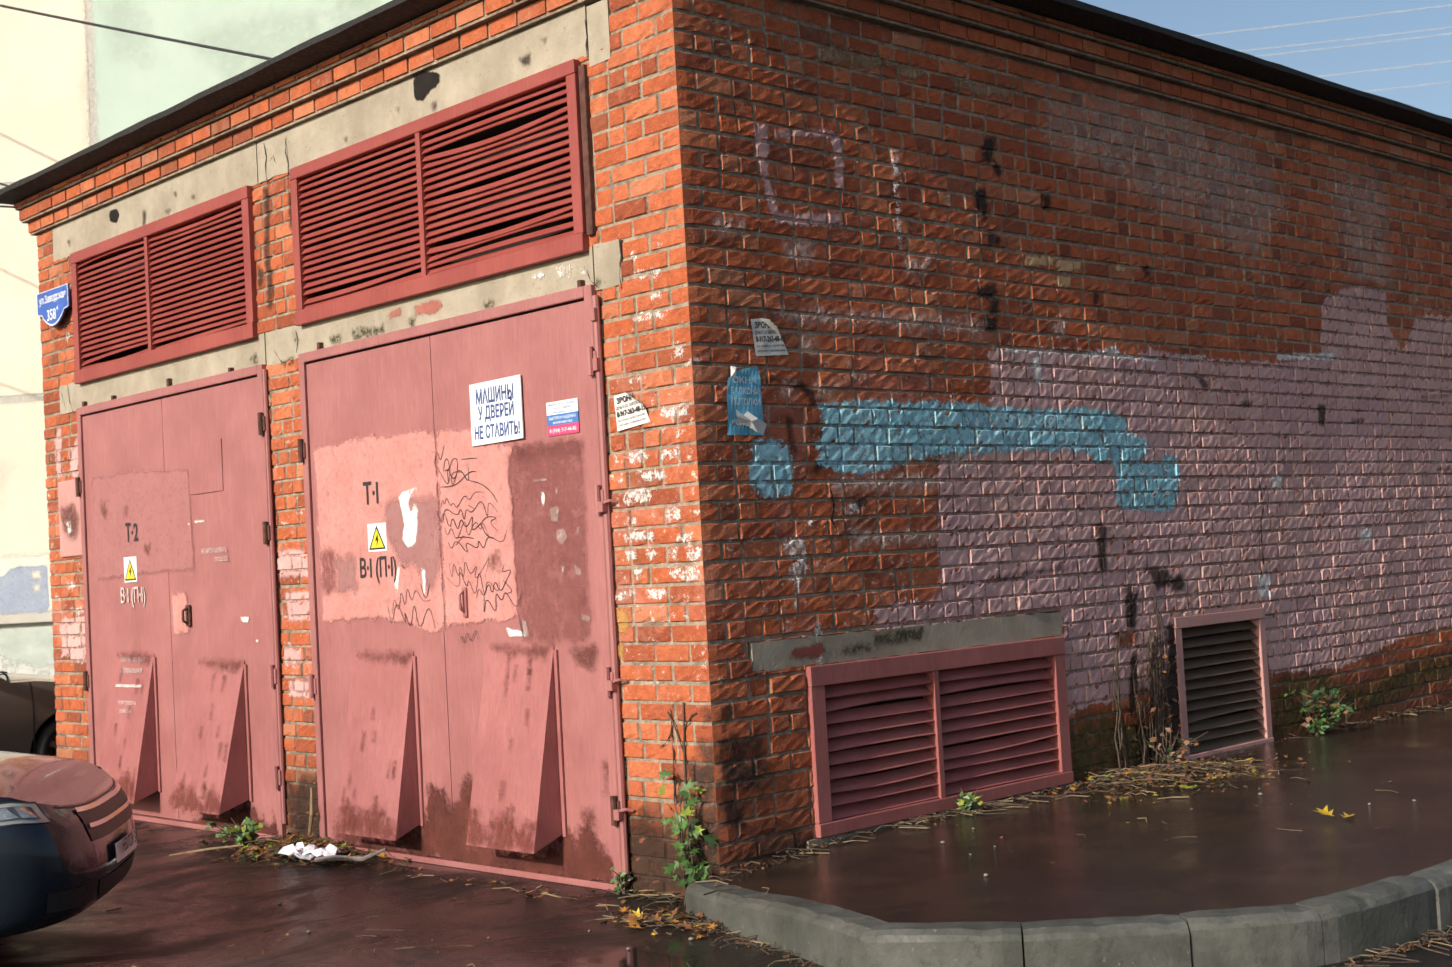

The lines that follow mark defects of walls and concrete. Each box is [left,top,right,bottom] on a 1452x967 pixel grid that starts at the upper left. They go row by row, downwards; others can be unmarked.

peeling [399,488,418,547]
corrosion [577,647,595,667]
water stain [1129,625,1181,769]
corrosion [334,773,614,884]
water stain [628,815,718,899]